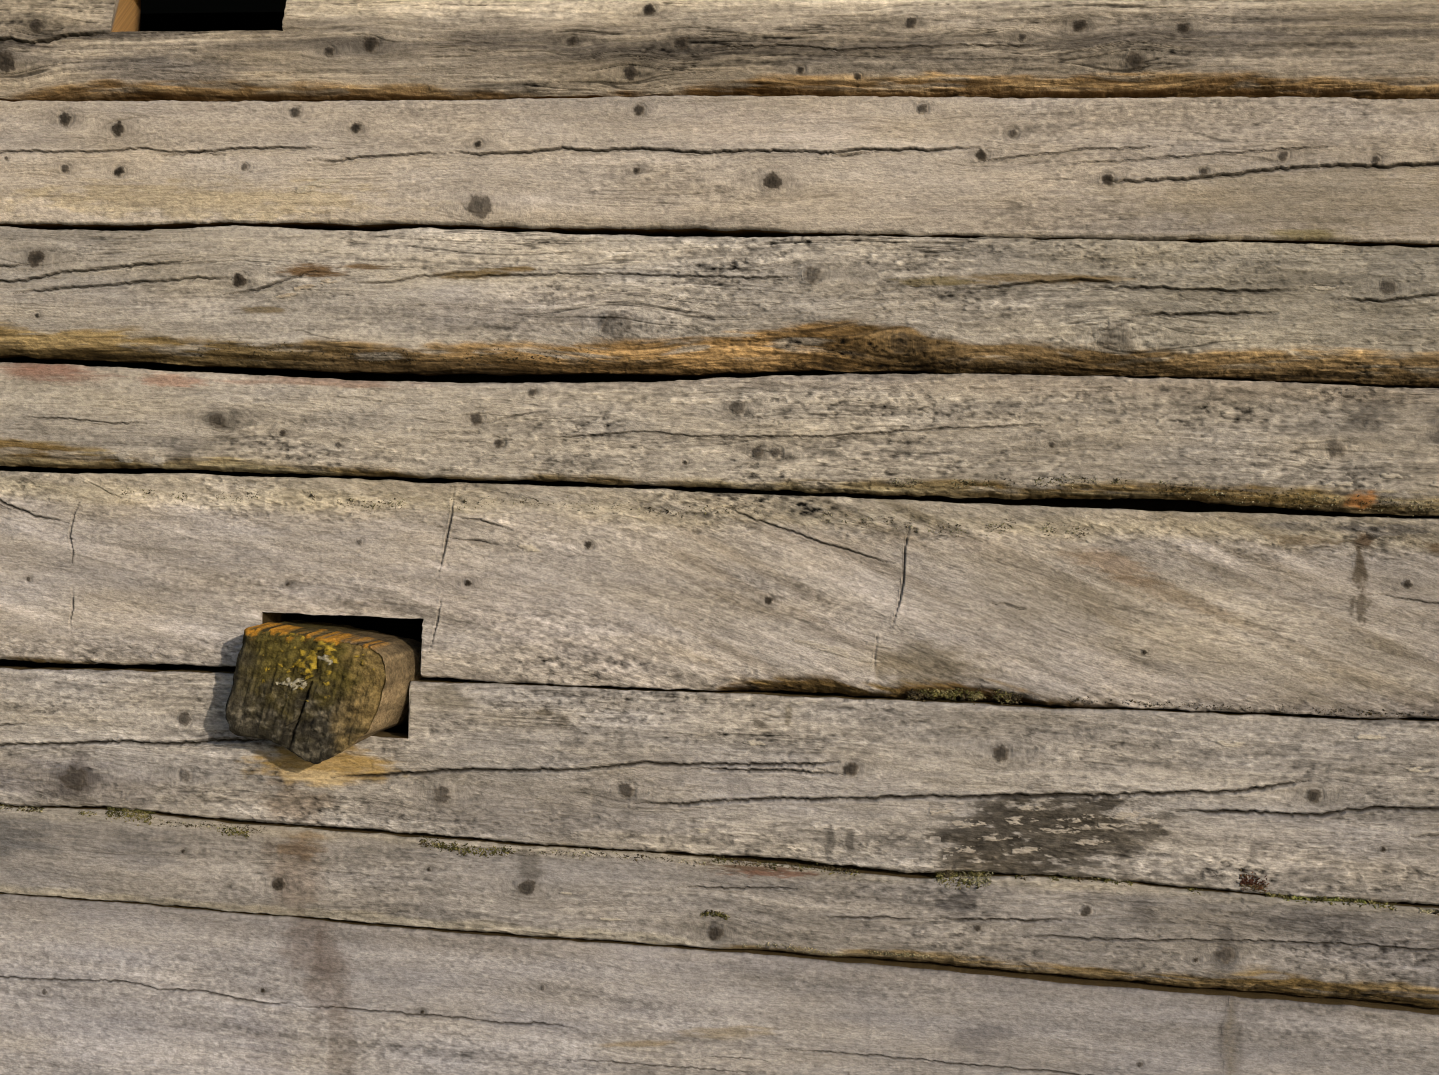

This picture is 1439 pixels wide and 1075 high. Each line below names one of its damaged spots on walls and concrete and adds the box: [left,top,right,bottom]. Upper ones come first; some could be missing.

crack [0,144,1439,184]
crack [0,259,801,295]
crack [956,277,1297,318]
crack [1330,293,1439,313]
crack [329,760,1439,838]
damp [232,743,425,1075]